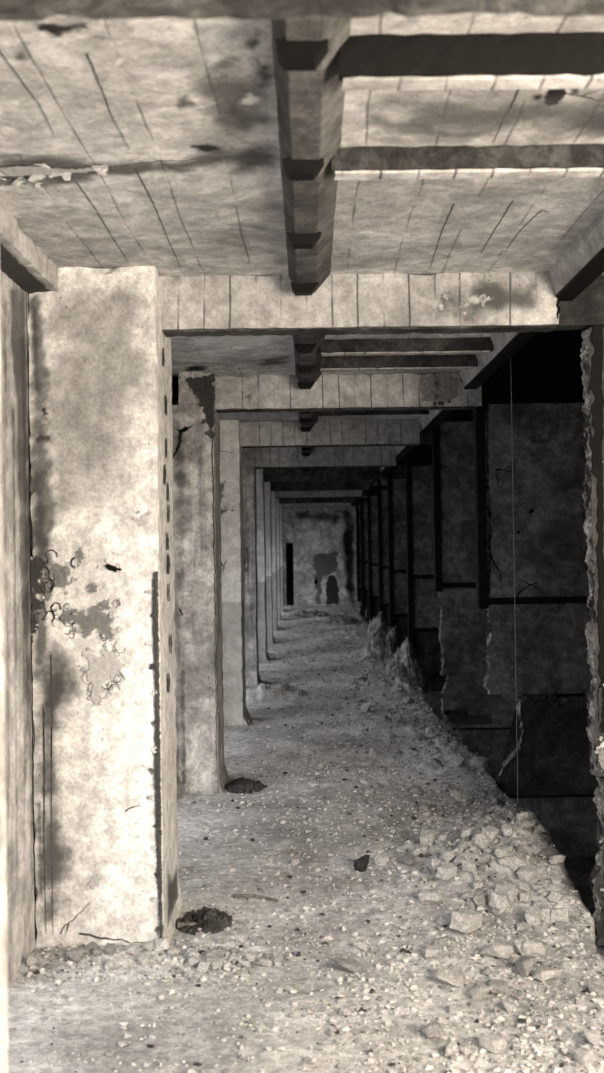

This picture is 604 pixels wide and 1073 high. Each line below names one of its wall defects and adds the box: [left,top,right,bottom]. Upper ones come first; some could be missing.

damp [374,89,604,141]
peeling [0,163,108,191]
spalling [165,374,216,439]
peeling [312,551,339,605]
crack [488,552,543,598]
peeling [30,547,127,706]
spalling [145,438,173,938]